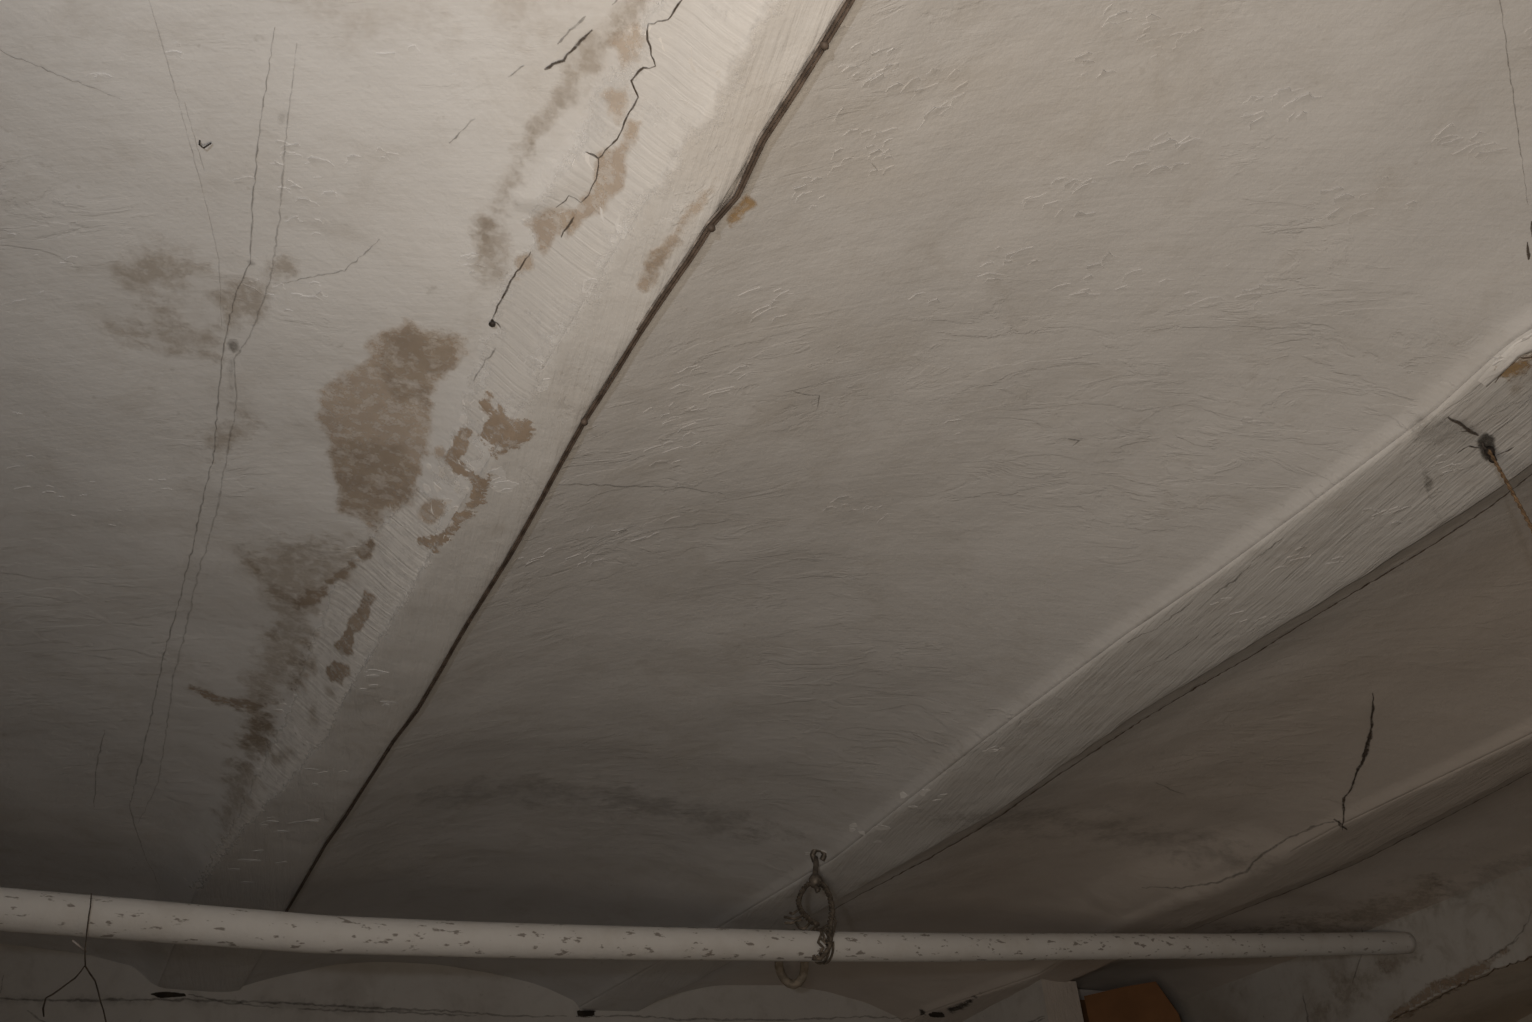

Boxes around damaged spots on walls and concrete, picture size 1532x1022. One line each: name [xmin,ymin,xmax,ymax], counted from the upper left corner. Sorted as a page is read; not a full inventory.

crack [492,0,682,328]
leakage [320,327,456,515]
spalling [417,391,534,553]
peeling [1478,333,1532,387]
leakage [294,540,375,605]
leakage [326,590,374,681]
crack [837,417,1532,926]
crack [1390,956,1532,1021]